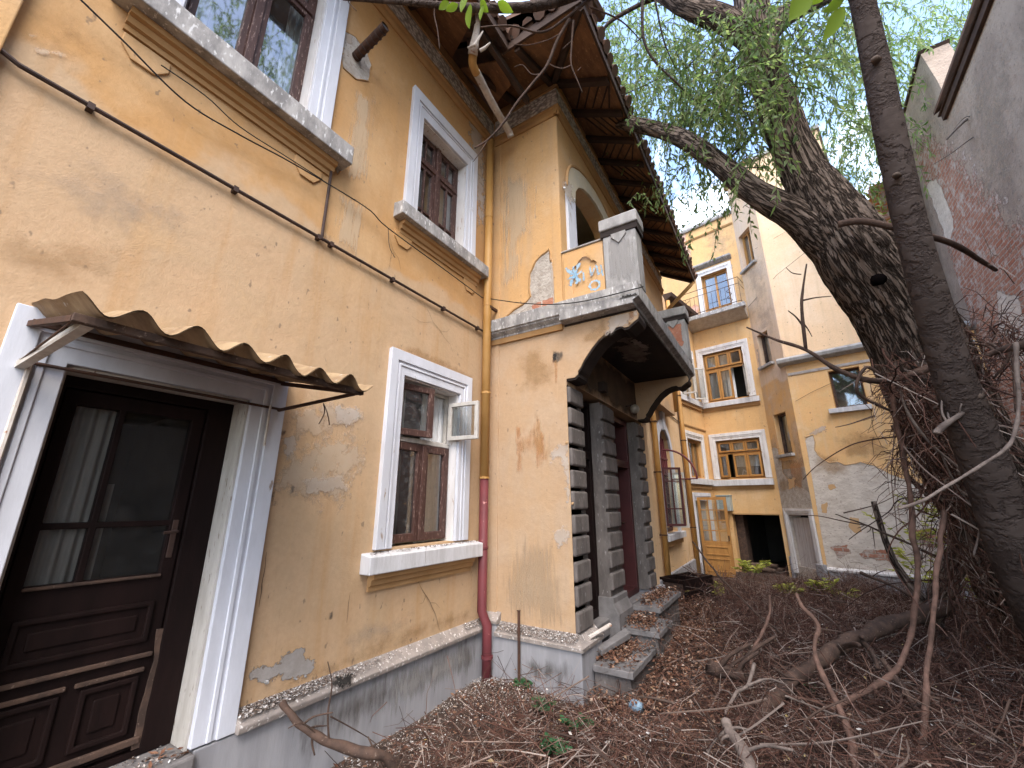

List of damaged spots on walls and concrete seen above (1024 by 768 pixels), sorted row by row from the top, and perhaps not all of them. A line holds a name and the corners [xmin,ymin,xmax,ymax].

spalling [504,248,554,317]
peeling [272,402,365,509]
peeling [771,426,947,575]
flaking render [249,647,315,684]